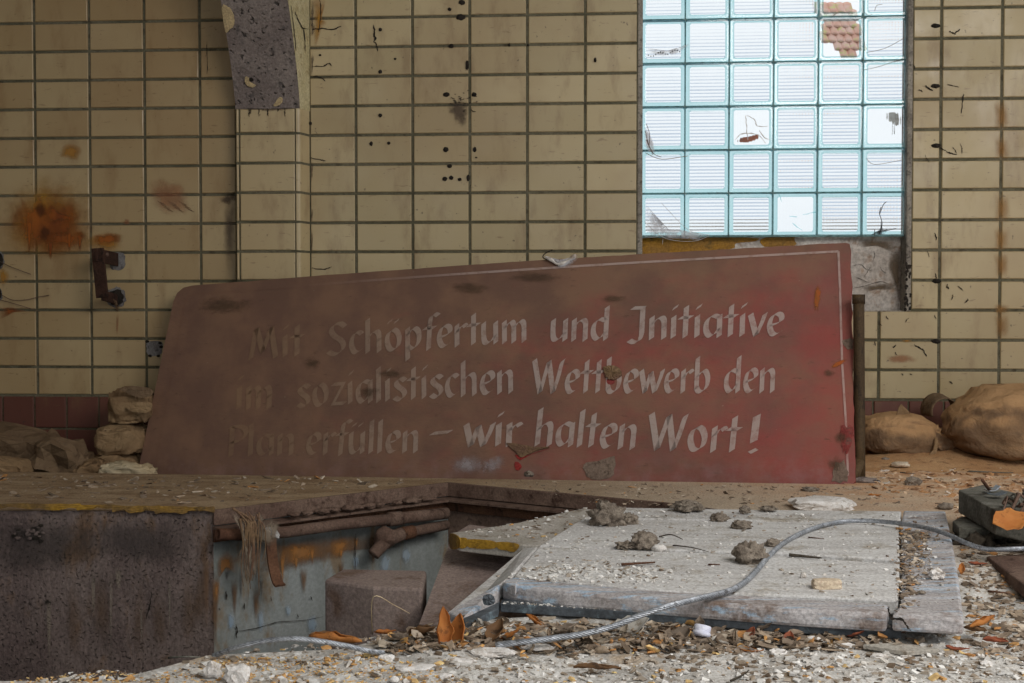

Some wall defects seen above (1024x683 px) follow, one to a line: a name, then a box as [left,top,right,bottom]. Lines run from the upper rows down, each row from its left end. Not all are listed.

flaking render [222,4,235,33]
rust [15,191,117,256]
rust [277,537,374,588]